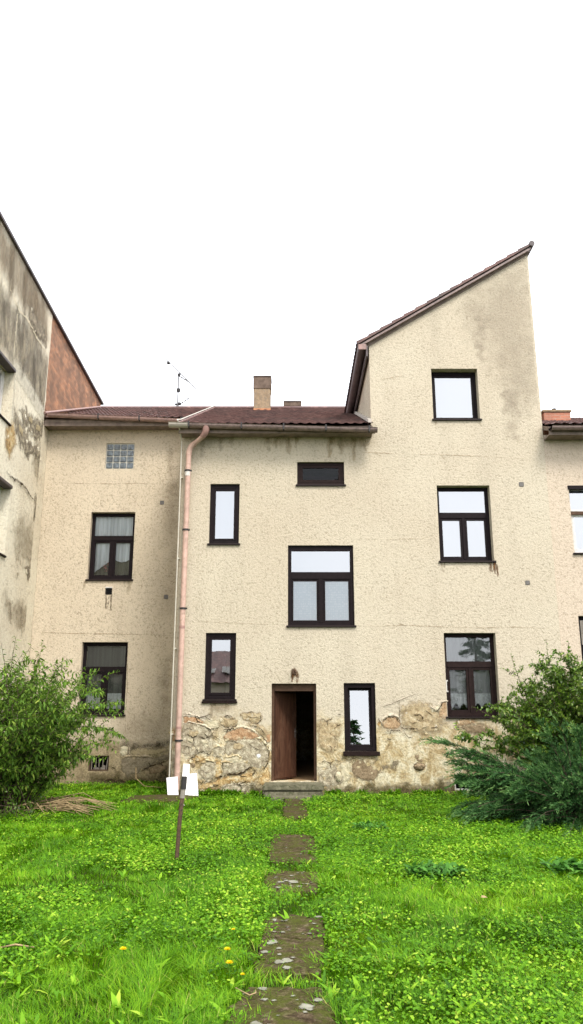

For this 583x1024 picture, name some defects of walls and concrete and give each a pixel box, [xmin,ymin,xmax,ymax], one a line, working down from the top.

water stain [0,223,47,420]
flaking render [5,407,43,461]
flaking render [120,711,271,793]
flaking render [317,714,381,788]
flaking render [377,700,492,735]